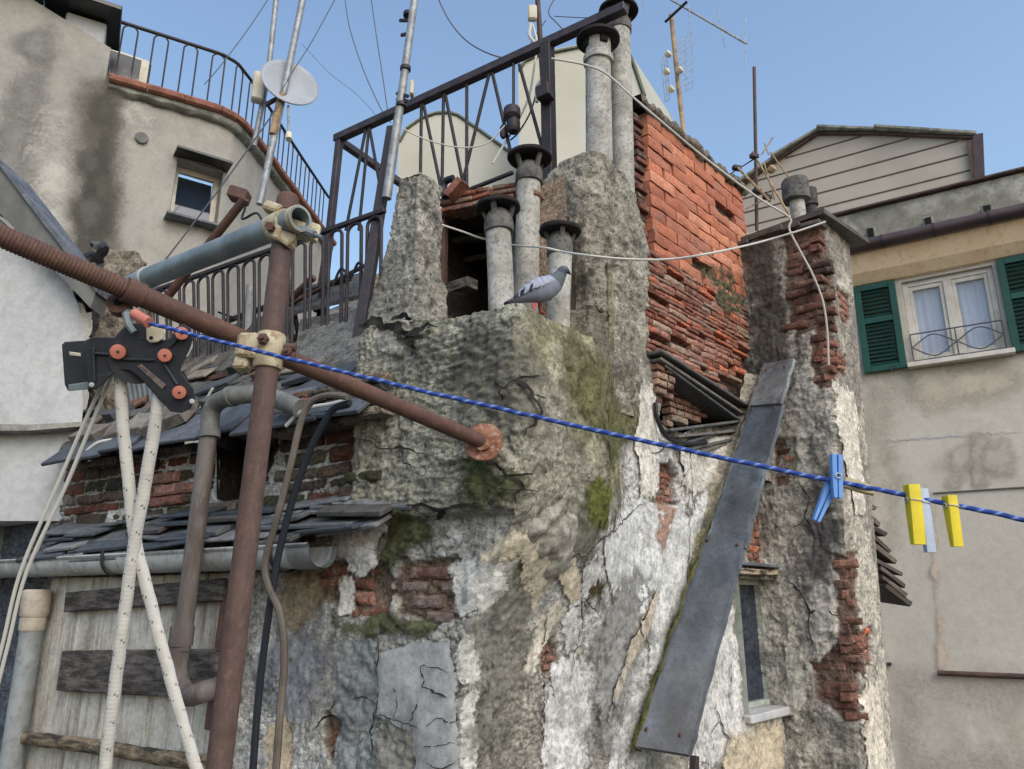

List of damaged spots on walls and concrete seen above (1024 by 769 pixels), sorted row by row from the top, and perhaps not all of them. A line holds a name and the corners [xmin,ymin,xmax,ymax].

water stain [0,29,160,255]
crack [494,375,546,436]
flaking render [782,230,866,516]
peeling [319,513,390,619]
crack [306,637,458,769]
peeling [402,380,730,769]
flaking render [813,550,887,769]